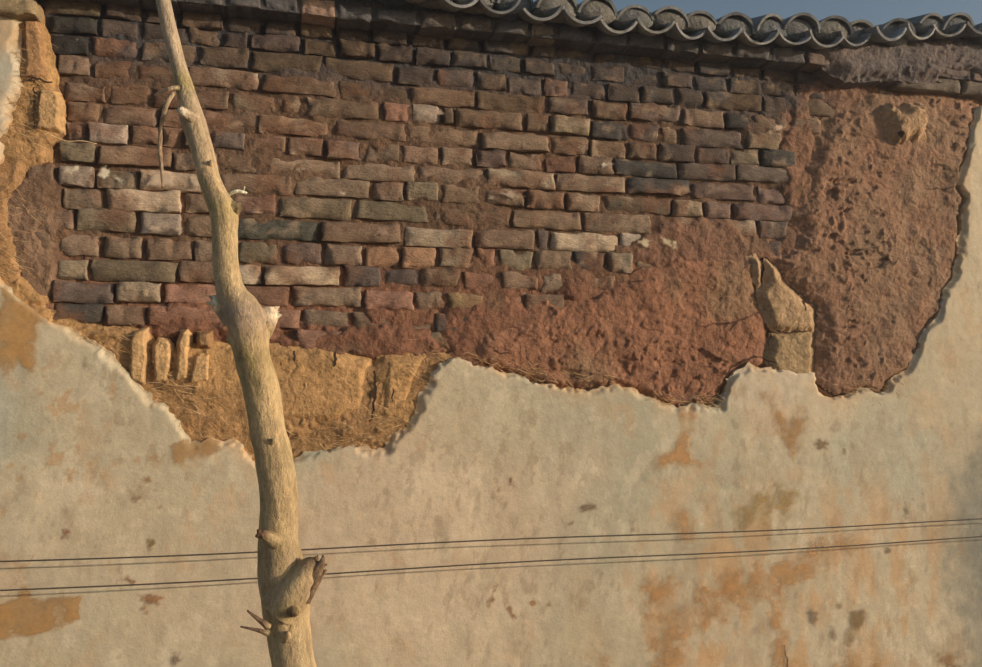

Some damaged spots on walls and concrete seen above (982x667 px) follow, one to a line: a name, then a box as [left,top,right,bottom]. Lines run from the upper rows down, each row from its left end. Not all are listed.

spalling [0,0,255,461]
crack [369,370,394,422]
spalling [174,11,982,462]
crack [701,258,837,397]